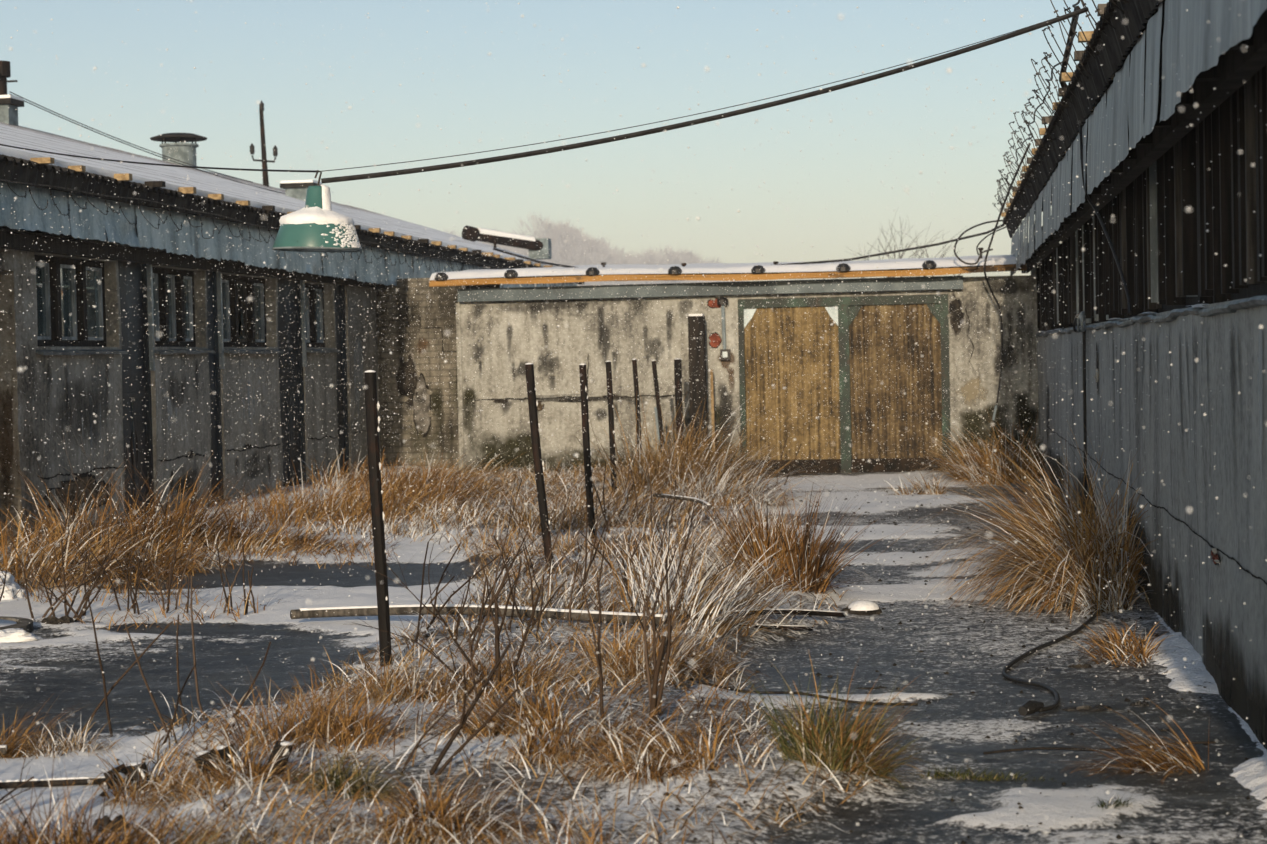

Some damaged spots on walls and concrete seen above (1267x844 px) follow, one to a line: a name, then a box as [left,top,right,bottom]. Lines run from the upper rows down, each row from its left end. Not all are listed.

leakage [508,299,617,360]
leakage [986,278,1028,324]
leakage [995,307,1033,373]
leakage [60,364,101,446]
leakage [463,389,475,430]
leakage [513,356,632,420]
crack [38,466,122,489]